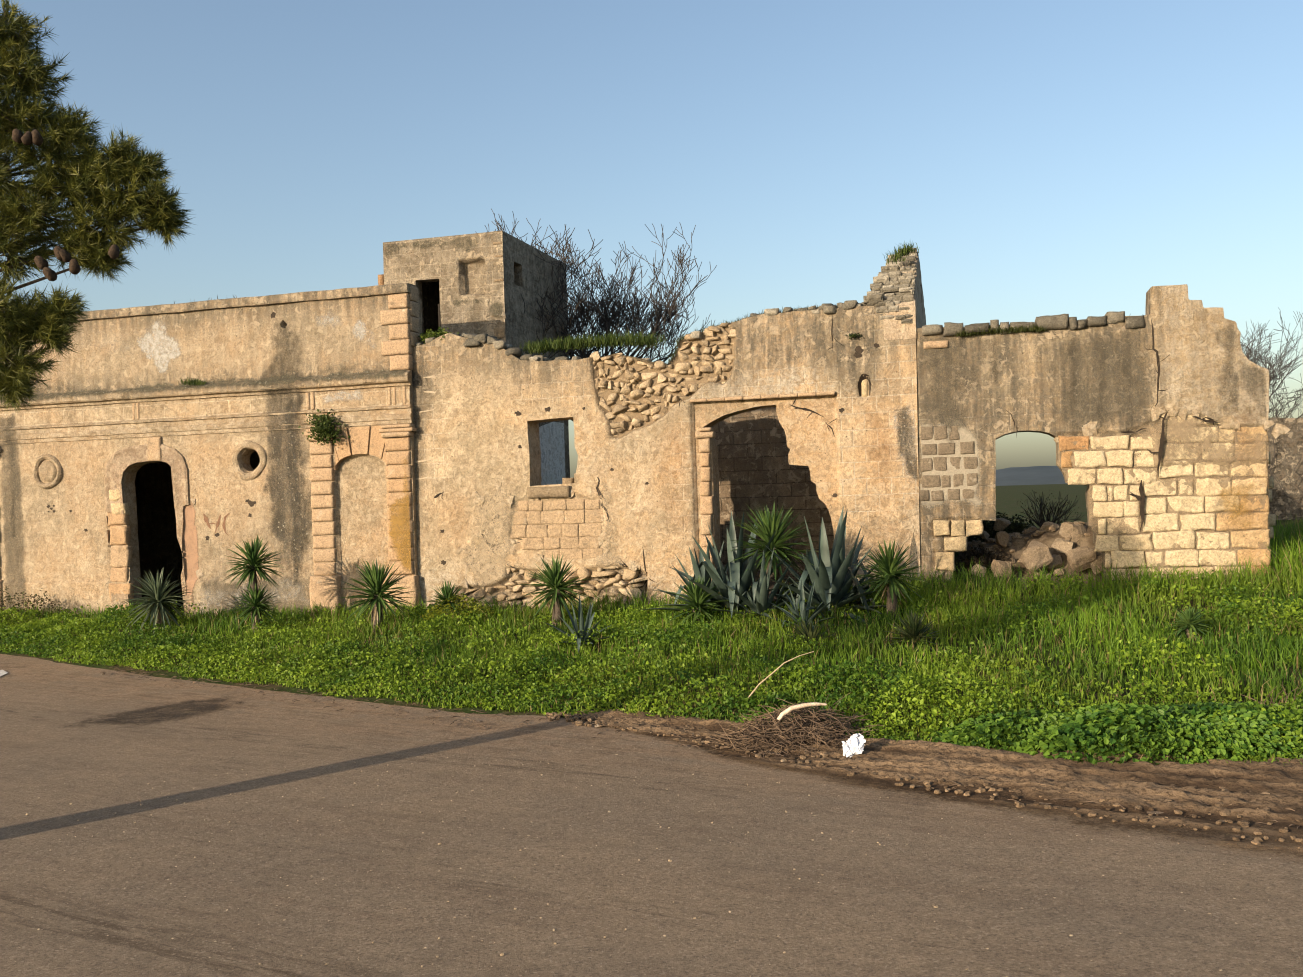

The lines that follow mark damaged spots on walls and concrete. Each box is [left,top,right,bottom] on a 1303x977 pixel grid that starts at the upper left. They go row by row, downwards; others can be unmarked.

leakage [0,418,25,610]
leakage [204,327,312,609]
flaking render [919,420,983,571]
crack [1121,319,1215,530]
flaking render [1054,401,1290,589]